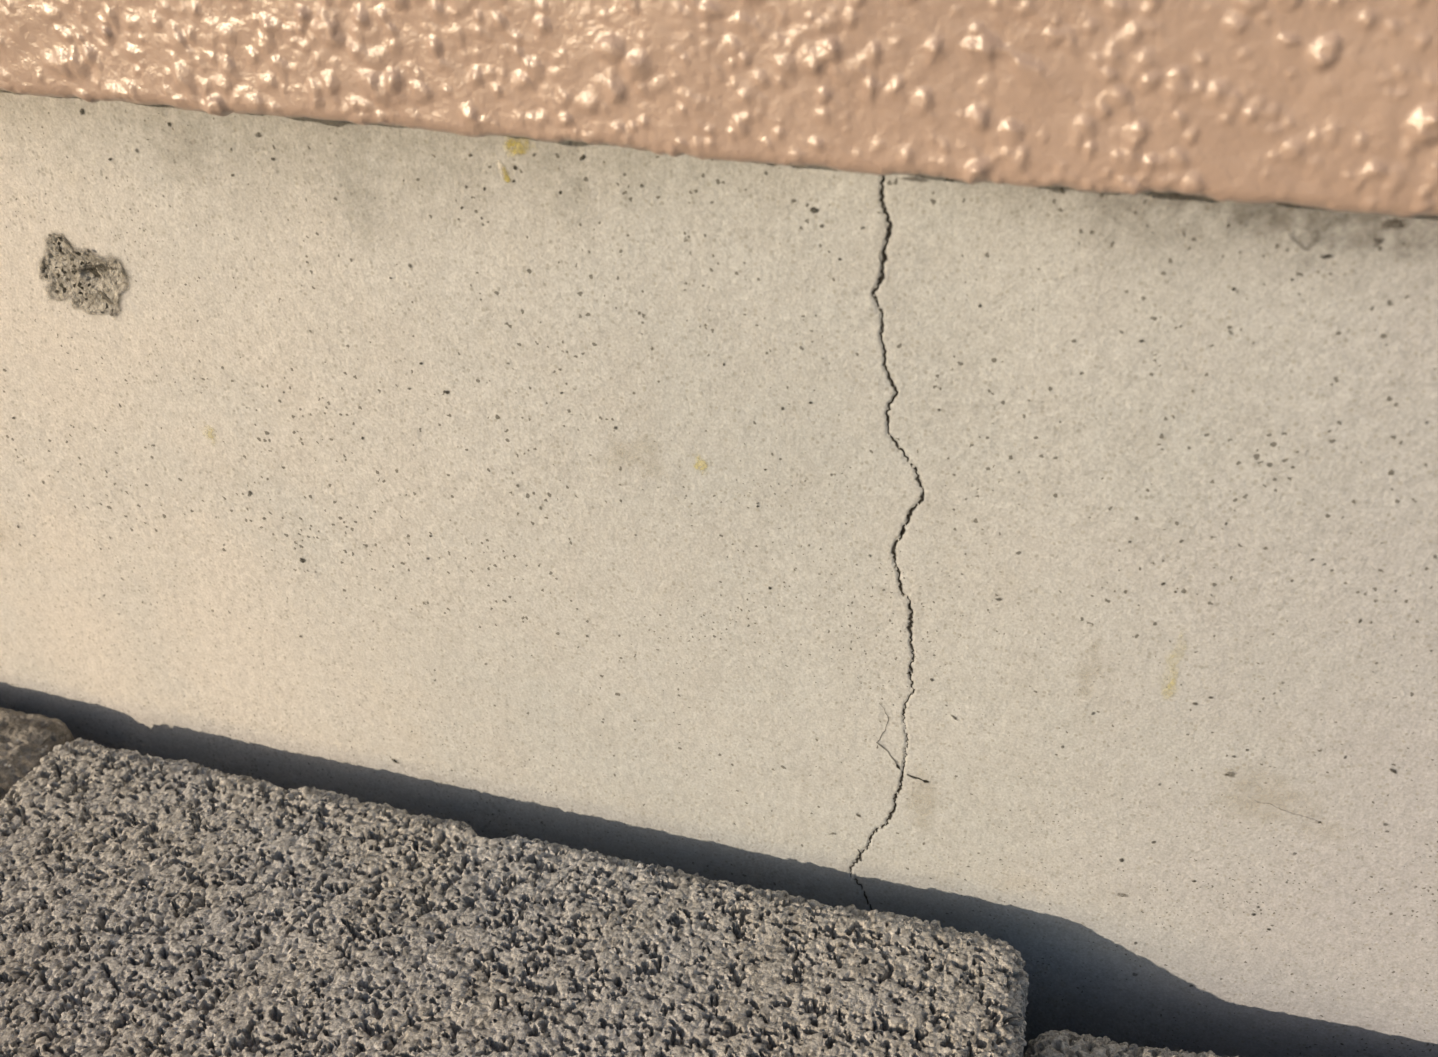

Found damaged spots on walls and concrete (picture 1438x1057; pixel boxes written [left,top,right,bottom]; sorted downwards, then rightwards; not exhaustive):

spalling [40,234,128,316]
crack [850,175,929,910]